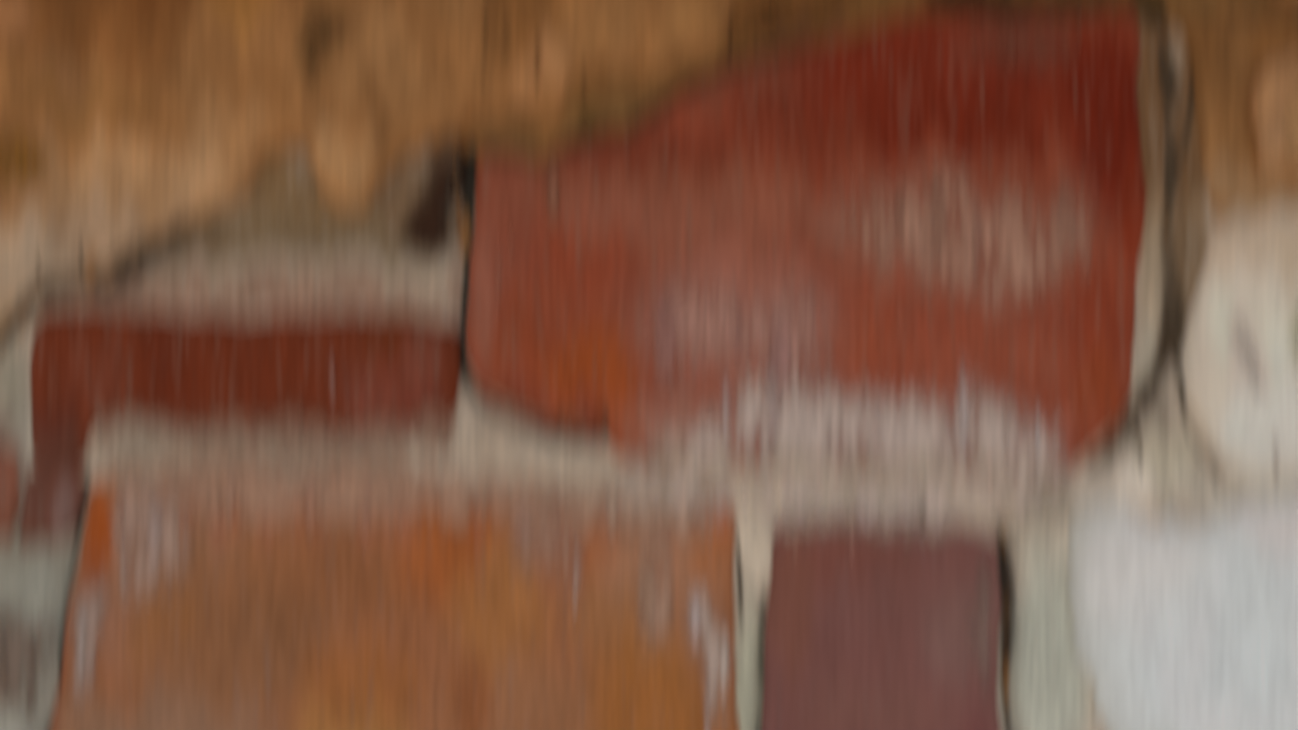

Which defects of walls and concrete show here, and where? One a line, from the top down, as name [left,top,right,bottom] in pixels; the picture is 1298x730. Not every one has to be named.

spalling [400,147,470,256]